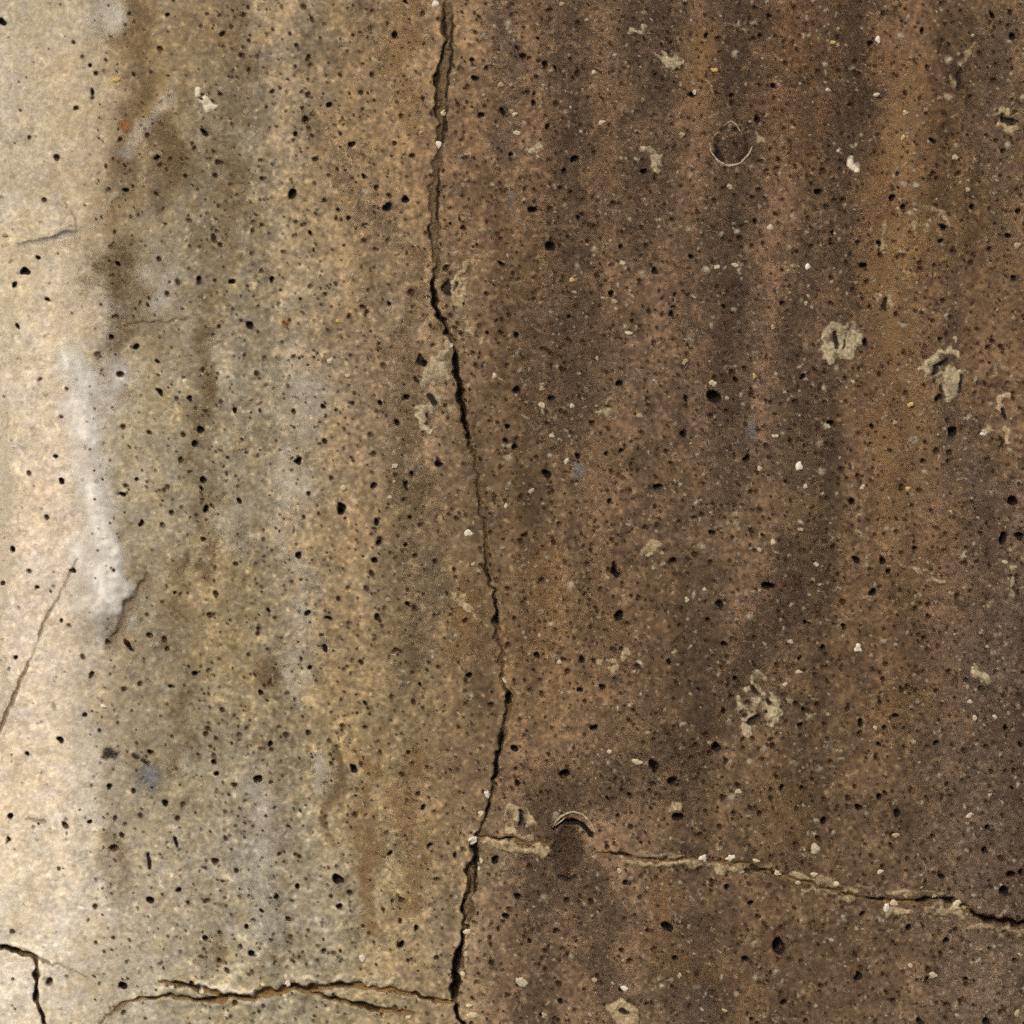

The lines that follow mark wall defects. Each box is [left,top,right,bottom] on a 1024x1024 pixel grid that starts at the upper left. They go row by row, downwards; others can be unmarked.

crack [0,945,60,1024]
crack [99,0,550,1024]
leakage [464,0,1024,1024]
crack [596,851,1024,936]